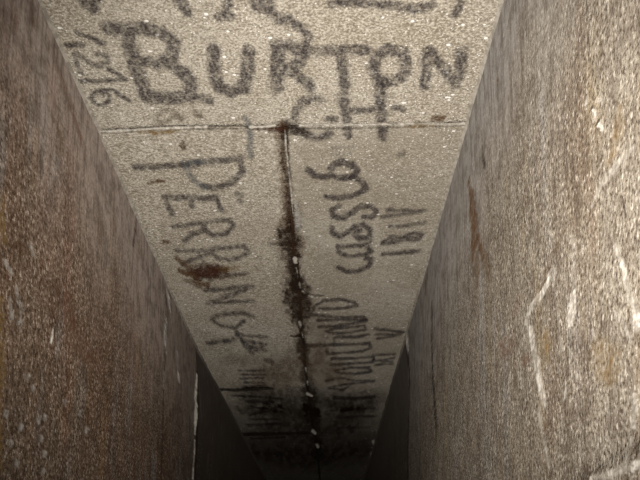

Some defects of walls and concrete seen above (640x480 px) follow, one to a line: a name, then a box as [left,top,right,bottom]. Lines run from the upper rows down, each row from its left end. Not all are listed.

crack [100,125,207,133]
crack [325,120,465,128]
crack [249,125,308,277]
rust [175,257,228,287]
leakage [253,122,369,467]
crack [290,296,313,342]
crack [242,358,320,479]